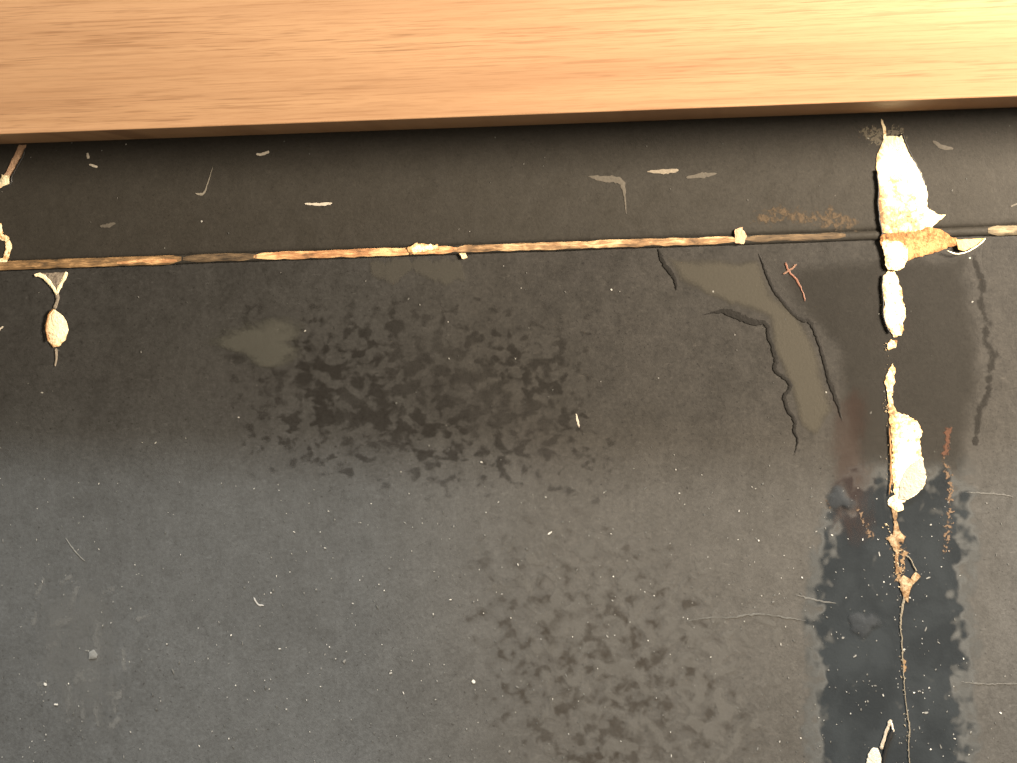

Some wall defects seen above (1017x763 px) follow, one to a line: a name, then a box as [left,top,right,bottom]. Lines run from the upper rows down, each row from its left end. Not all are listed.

crack [0,223,12,262]
crack [0,145,26,190]
peeling [876,119,986,271]
peeling [34,272,69,366]
crack [867,255,926,763]
damp [803,464,979,763]